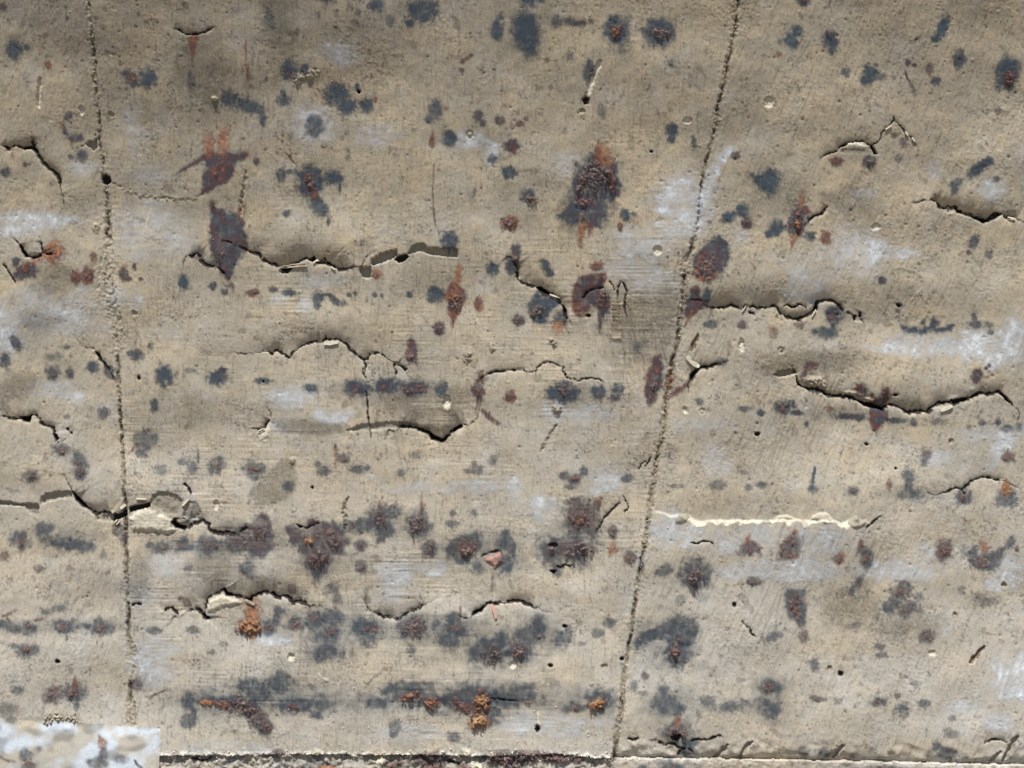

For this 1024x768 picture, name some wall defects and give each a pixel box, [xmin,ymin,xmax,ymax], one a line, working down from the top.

rust [181,134,248,287]
rust [558,142,623,243]
rust [512,262,610,331]
rust [684,235,729,324]
crack [257,337,473,443]
crack [793,370,1013,415]
crack [71,488,151,525]
crack [171,483,248,537]
leakage [499,530,515,573]
crack [132,588,316,620]
leakage [135,627,172,680]
leakage [258,634,290,646]